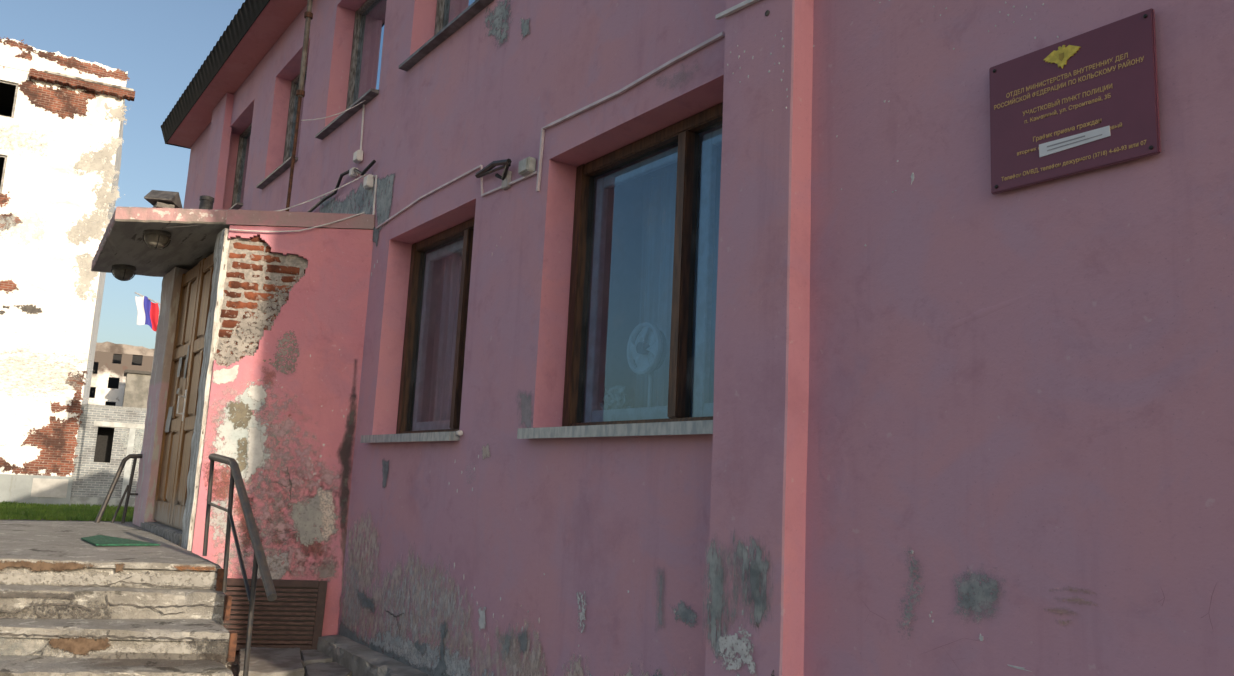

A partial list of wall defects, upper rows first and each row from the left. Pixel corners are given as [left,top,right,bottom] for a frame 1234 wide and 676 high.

flaking render [0,37,130,84]
flaking render [0,192,44,245]
flaking render [18,79,127,302]
peeling [320,173,395,276]
flaking render [0,225,338,619]
damp [339,395,356,556]
peeling [48,636,230,665]
peeling [713,624,774,676]